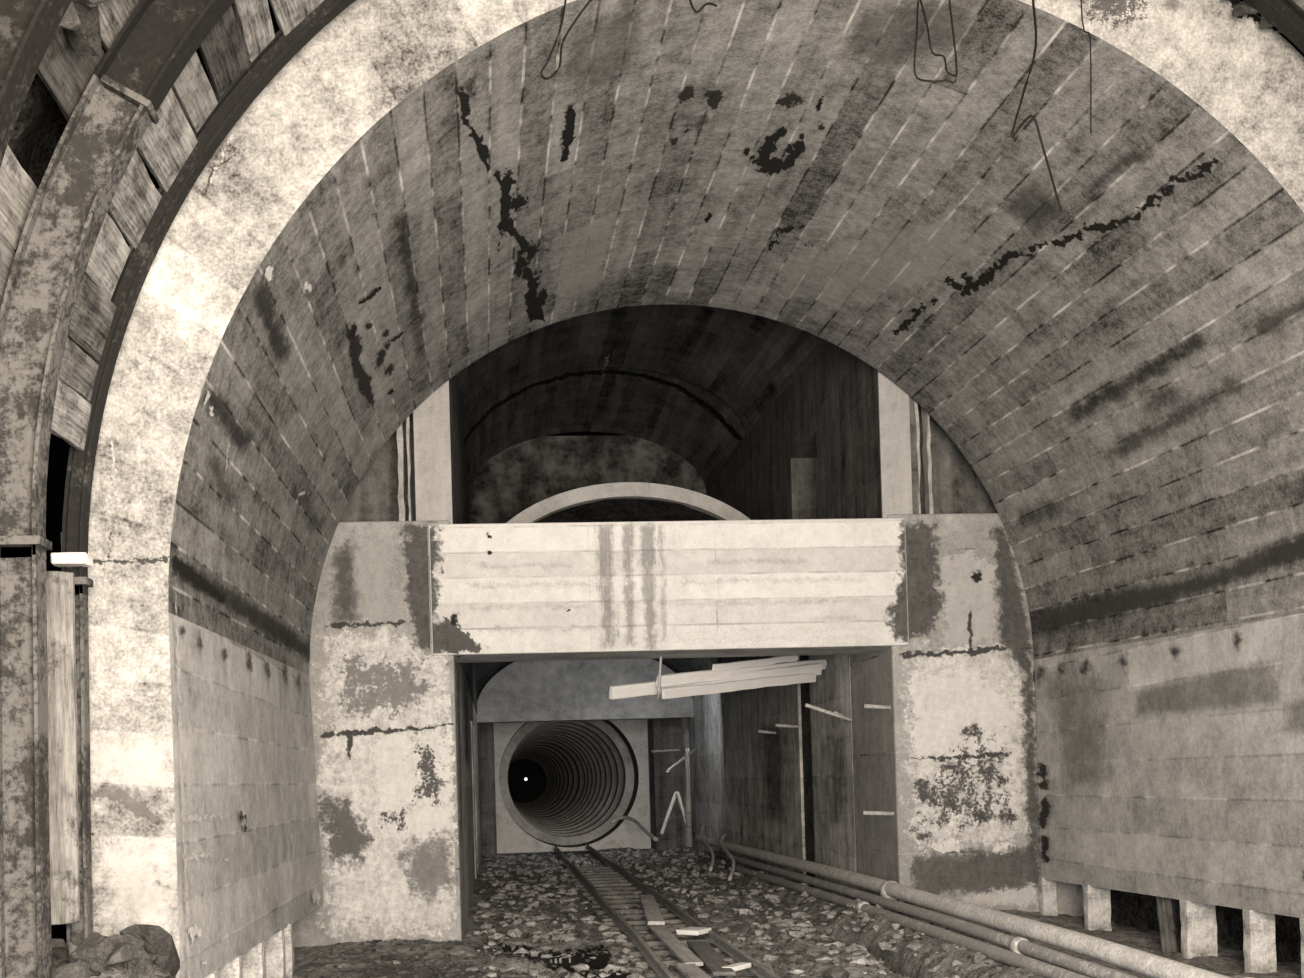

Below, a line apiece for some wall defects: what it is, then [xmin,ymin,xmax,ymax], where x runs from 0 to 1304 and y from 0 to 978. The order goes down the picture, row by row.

spalling [559,105,576,163]
spalling [743,91,825,176]
crack [456,78,555,323]
crack [888,157,1218,341]
water stain [600,528,614,642]
crack [320,723,454,760]
water stain [911,528,1304,910]
water stain [317,794,374,863]